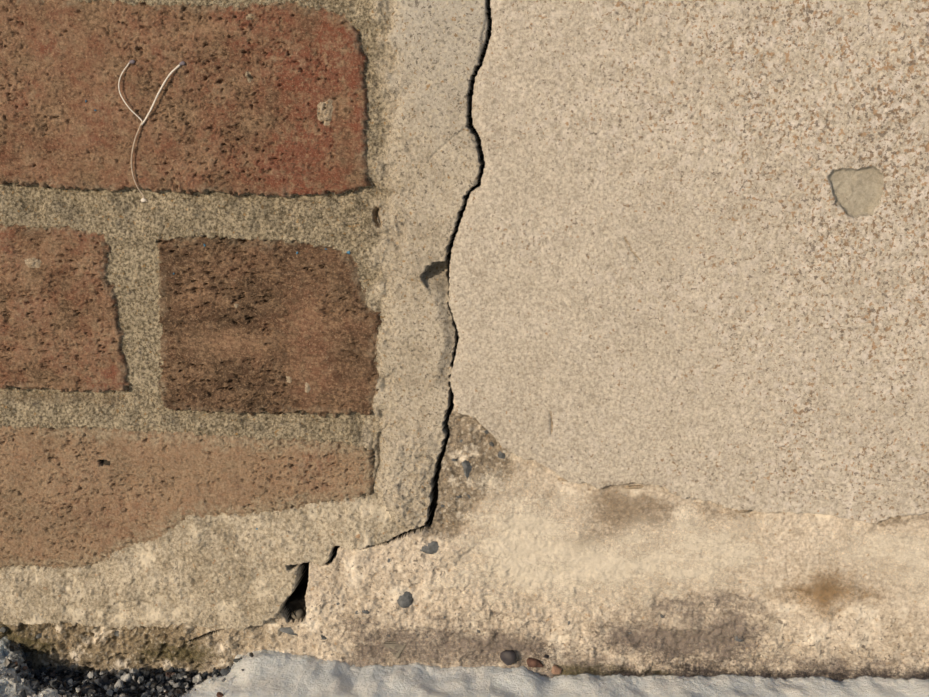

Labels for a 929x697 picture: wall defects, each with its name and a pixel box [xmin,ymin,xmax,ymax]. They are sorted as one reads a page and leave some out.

crack [430,0,492,275]
hole [281,562,309,623]
crack [328,298,460,563]
water stain [345,471,929,681]
spalling [428,407,929,537]